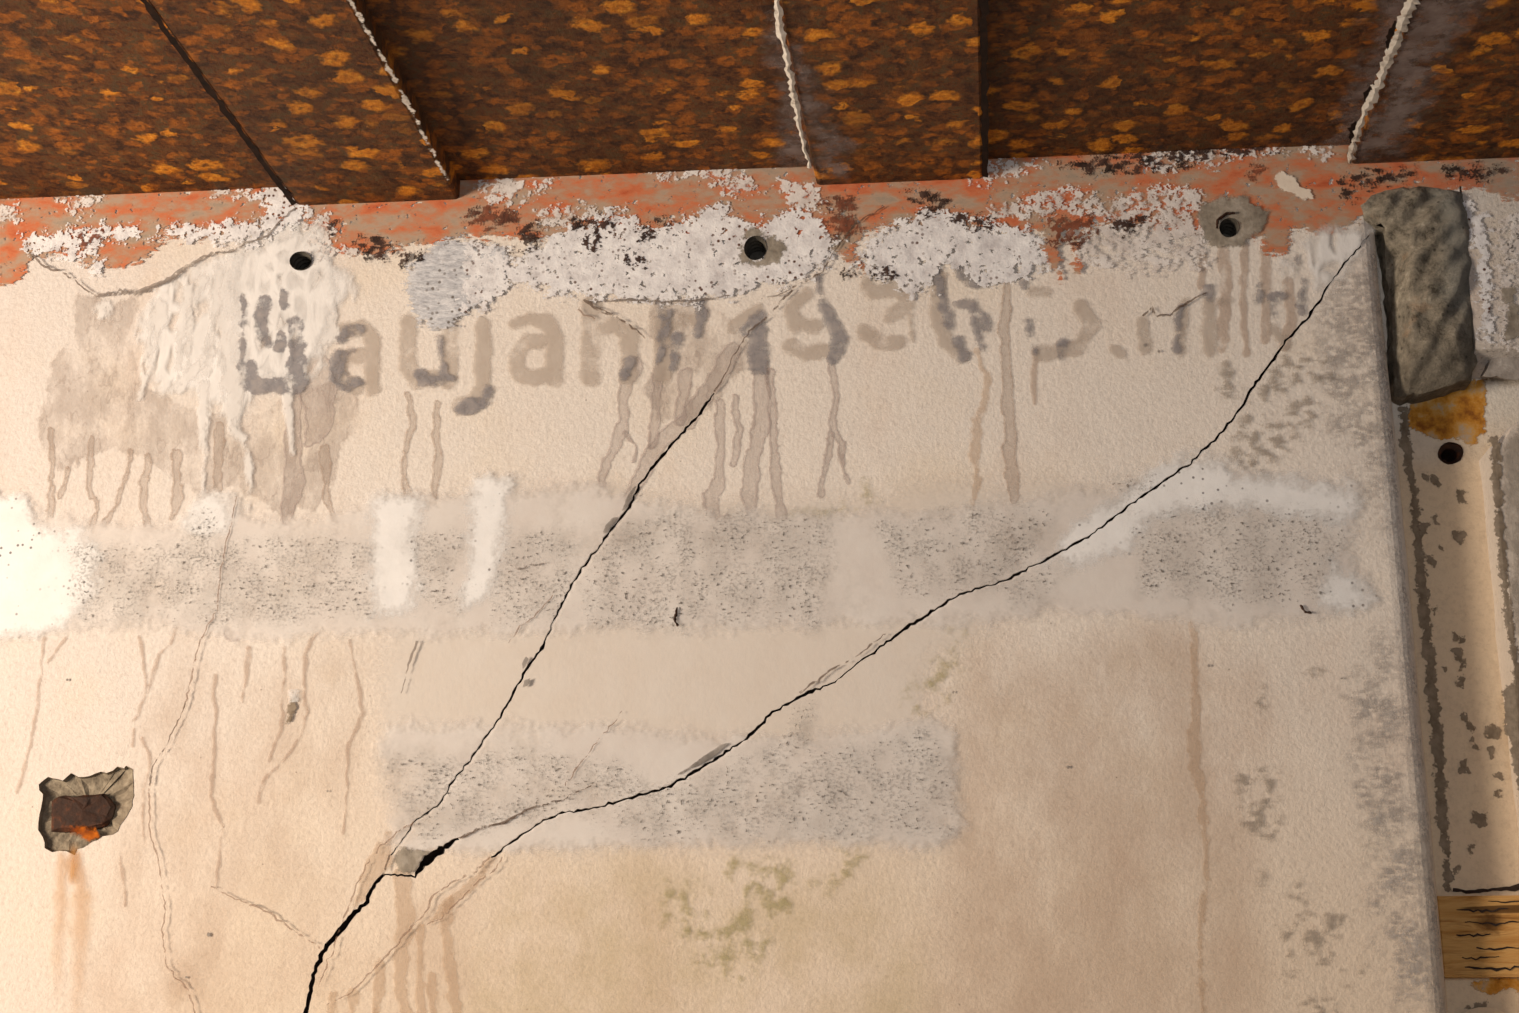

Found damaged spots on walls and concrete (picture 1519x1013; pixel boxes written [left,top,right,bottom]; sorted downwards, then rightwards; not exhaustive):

damp [40,222,368,642]
damp [587,342,824,629]
crack [211,206,1369,1013]
damp [1135,506,1342,606]
peeling [1417,515,1468,568]
rust [1408,379,1487,446]
peeling [1443,632,1467,689]
spalling [1458,435,1519,798]
spalling [38,766,134,855]
crack [148,496,237,1013]
damp [641,709,952,840]
peeling [1453,810,1487,875]